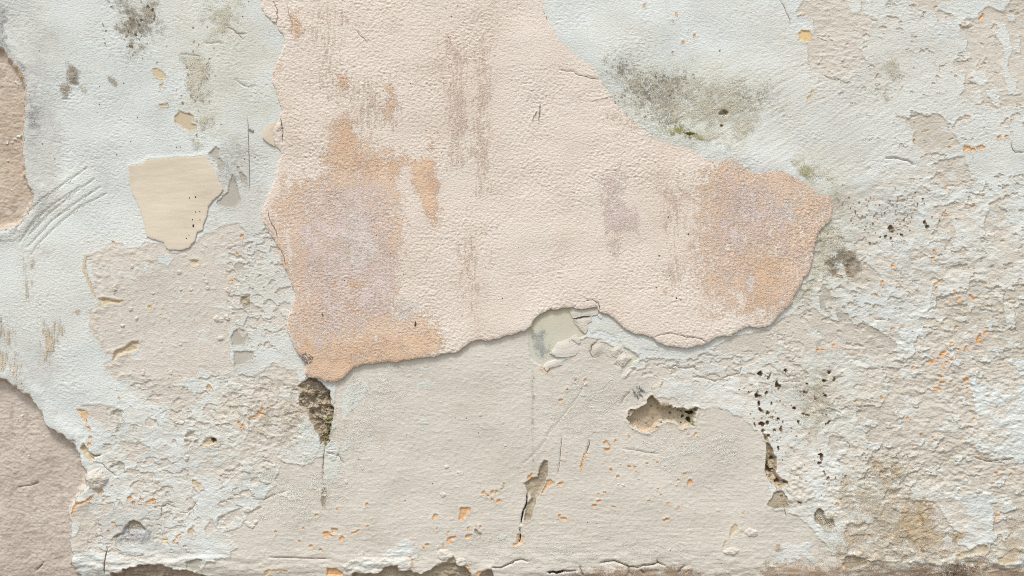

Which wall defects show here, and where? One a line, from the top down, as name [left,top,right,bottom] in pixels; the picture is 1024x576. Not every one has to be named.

water stain [111,0,163,63]
flaking render [0,47,34,230]
water stain [602,46,862,330]
peeling [838,190,930,249]
flaking render [0,314,205,576]
spalling [184,429,224,451]